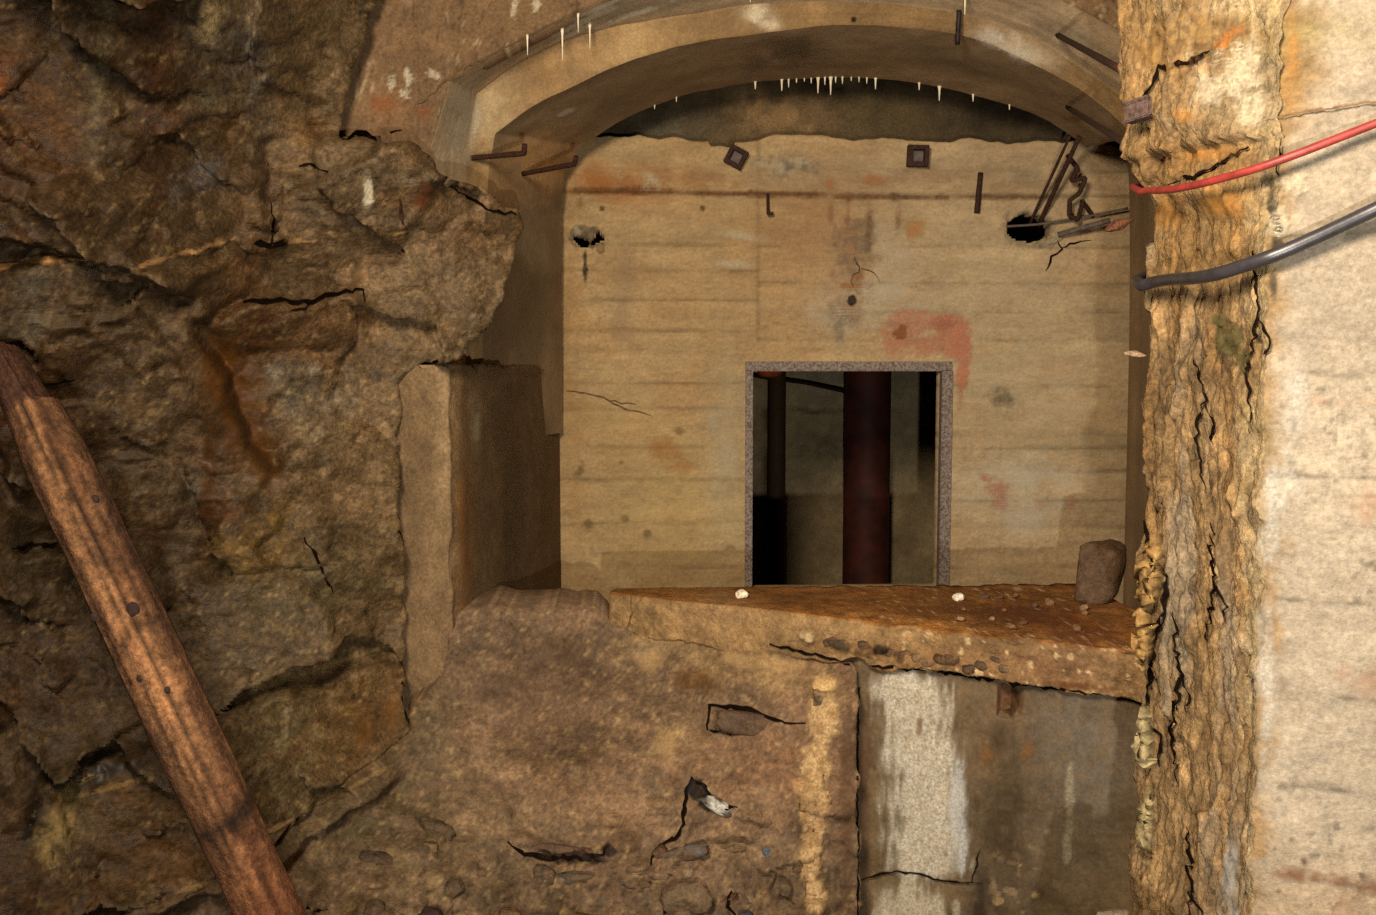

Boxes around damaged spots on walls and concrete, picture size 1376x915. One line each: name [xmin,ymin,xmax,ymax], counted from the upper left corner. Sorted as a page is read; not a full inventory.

crack [507,841,609,861]
crack [650,777,736,865]
crack [769,643,1109,915]